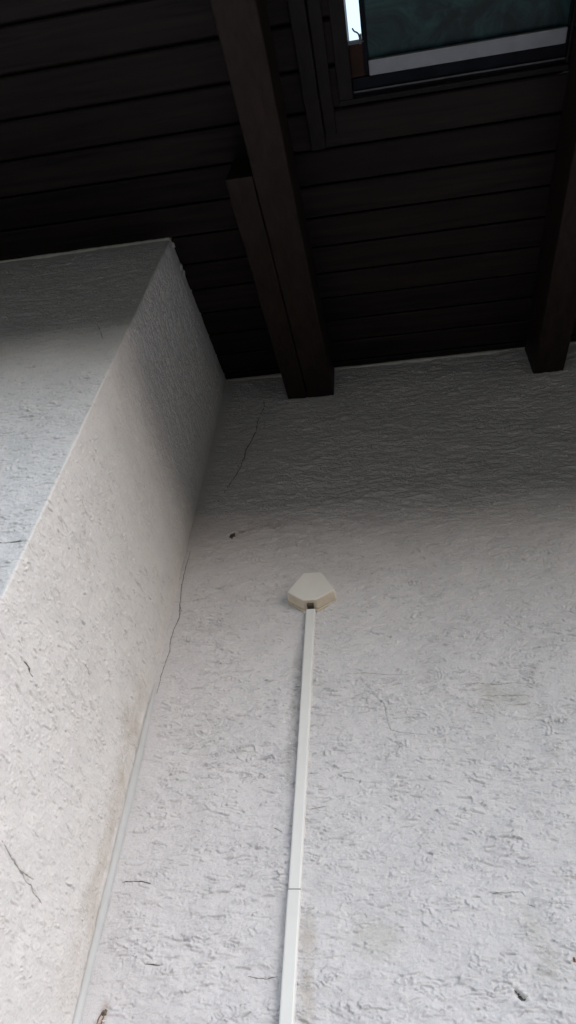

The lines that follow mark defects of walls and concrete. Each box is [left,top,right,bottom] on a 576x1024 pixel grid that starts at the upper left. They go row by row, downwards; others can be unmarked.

crack [156,551,191,694]
crack [2,841,41,902]